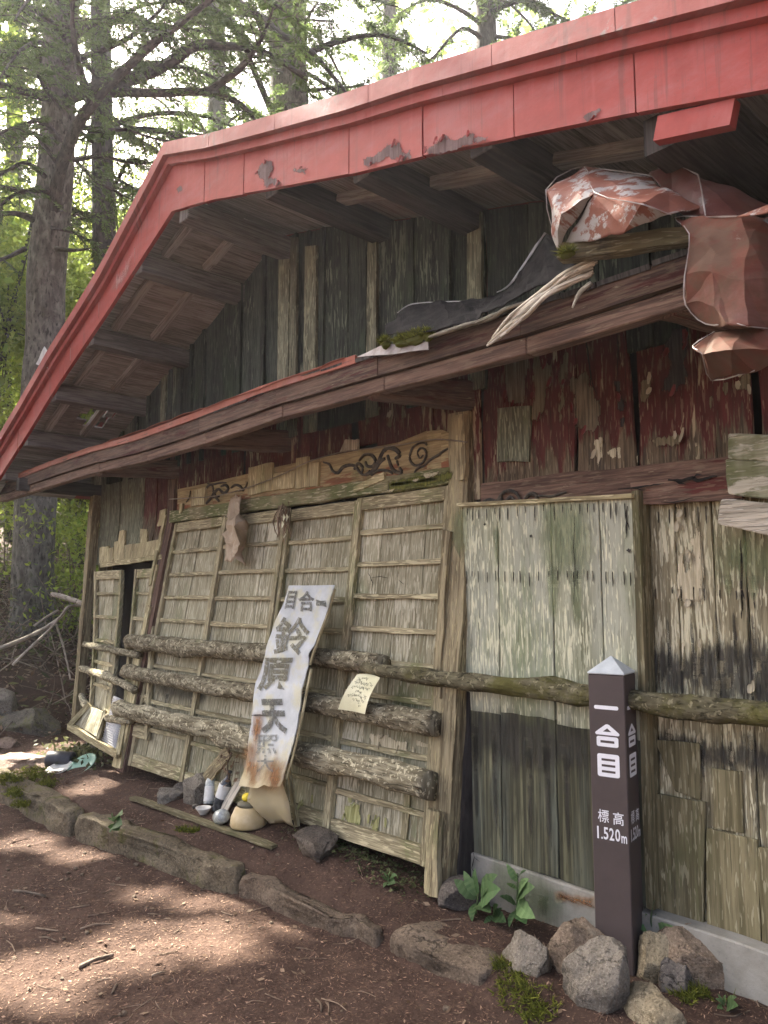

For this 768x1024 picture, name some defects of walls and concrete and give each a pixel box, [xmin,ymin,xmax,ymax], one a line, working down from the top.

peeling [363,139,411,167]
peeling [424,129,488,155]
peeling [255,158,281,187]
peeling [502,356,552,422]
peeling [641,372,652,403]
peeling [709,373,751,409]
peeling [569,371,621,465]
peeling [649,427,684,447]